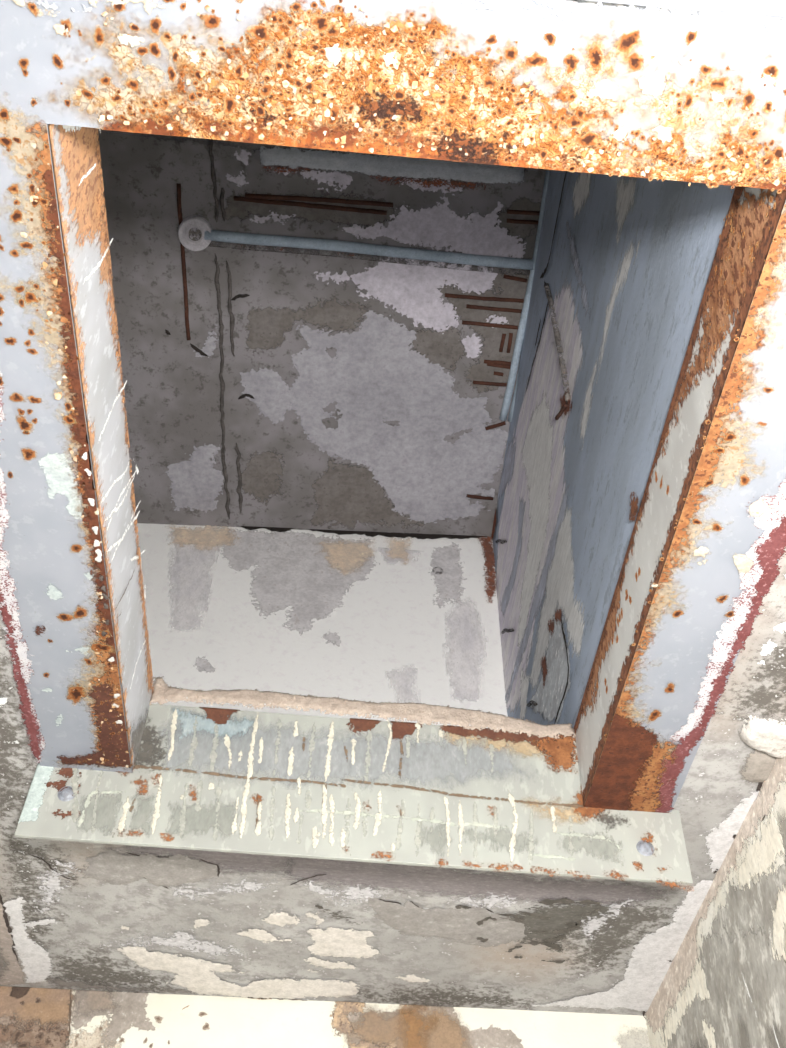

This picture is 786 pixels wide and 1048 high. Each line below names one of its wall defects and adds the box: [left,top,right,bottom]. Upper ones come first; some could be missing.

peeling [220,146,541,634]
rust [0,0,786,822]
leakage [170,525,235,630]
leakage [447,602,484,701]
peeling [670,478,786,743]
leakage [33,860,79,913]
rust [462,861,590,880]
rust [604,861,644,881]
peeling [527,754,786,1048]
crack [65,990,73,1046]
peeling [0,897,162,1048]
leakage [352,1004,468,1048]